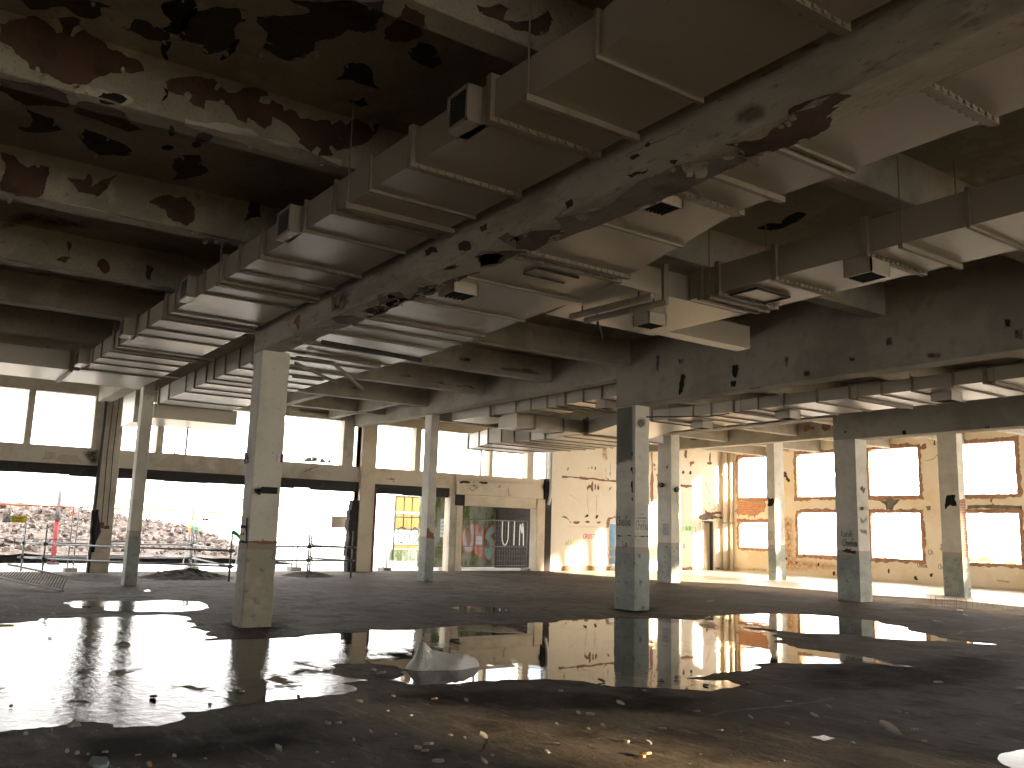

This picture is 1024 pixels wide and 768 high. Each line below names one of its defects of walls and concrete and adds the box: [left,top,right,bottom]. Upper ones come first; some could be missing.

peeling [476,3,554,35]
peeling [0,0,144,161]
peeling [161,76,380,181]
peeling [335,62,379,92]
flaking render [0,152,228,245]
spalling [331,93,852,325]
flaking render [735,453,775,552]
flaking render [945,426,1024,596]